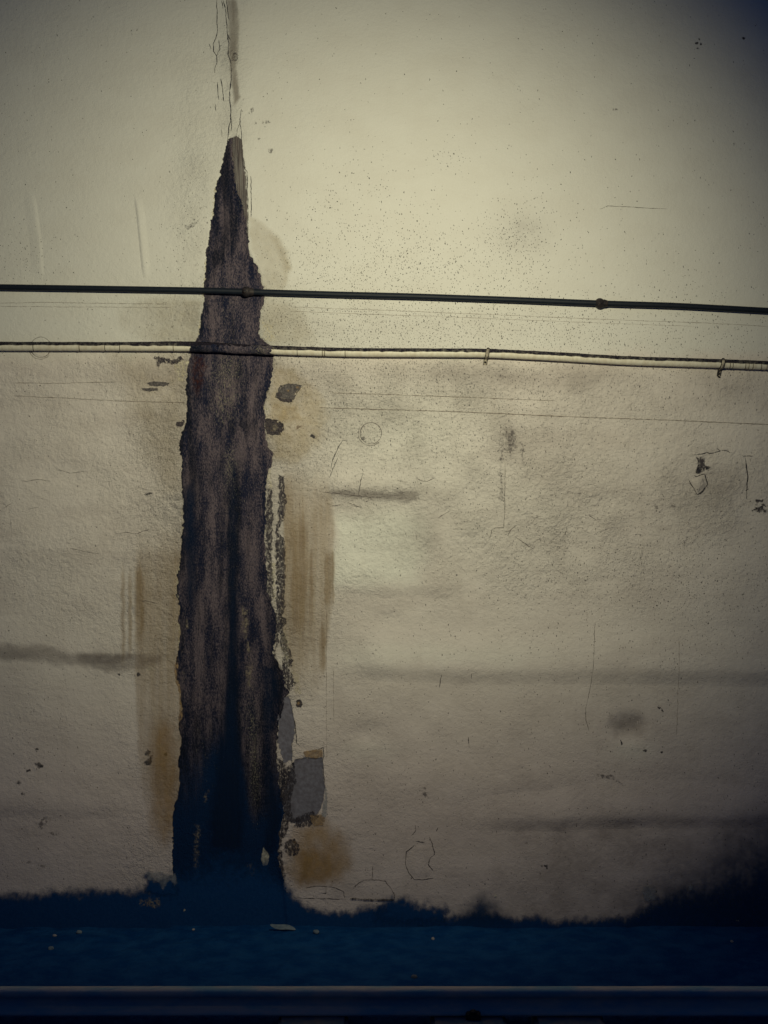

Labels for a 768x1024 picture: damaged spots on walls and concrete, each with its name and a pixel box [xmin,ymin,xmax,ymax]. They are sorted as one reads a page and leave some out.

crack [209,0,252,215]
damp [0,136,768,929]
spalling [277,673,325,856]